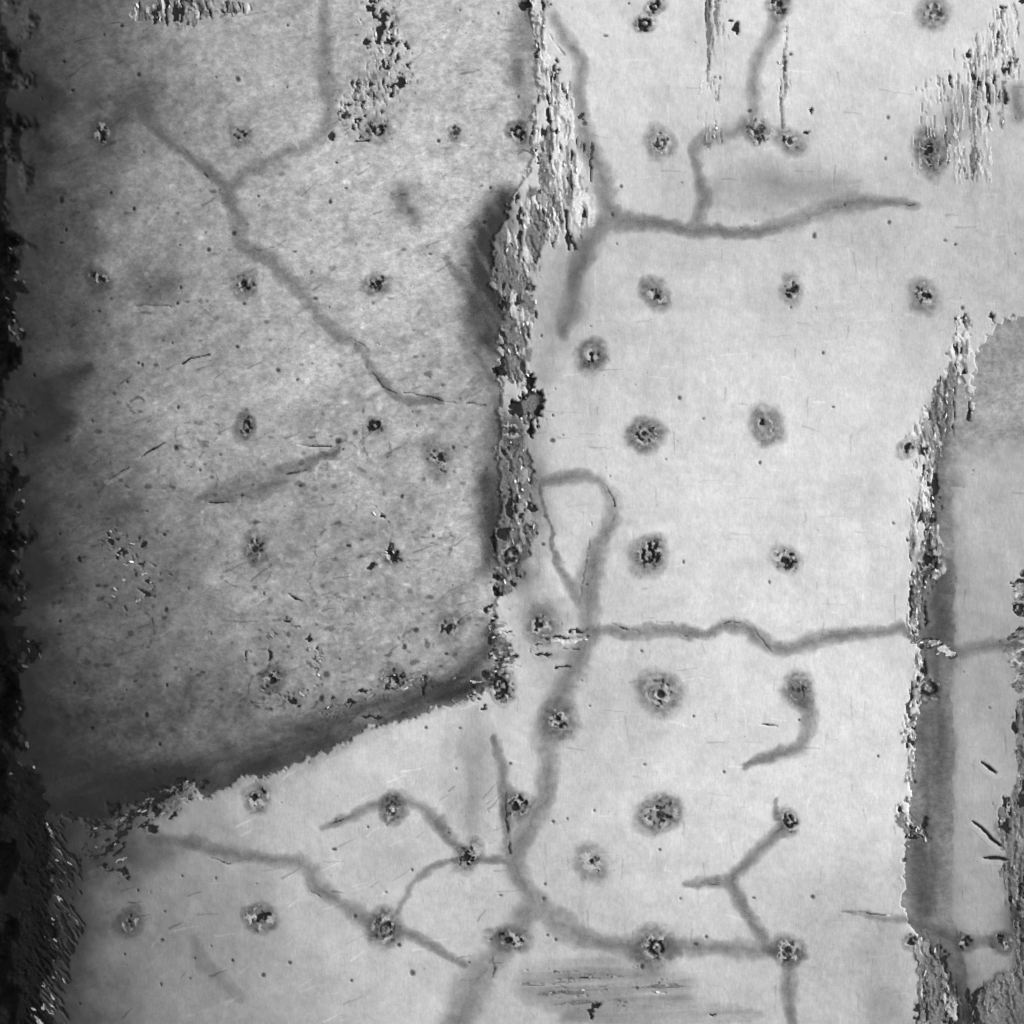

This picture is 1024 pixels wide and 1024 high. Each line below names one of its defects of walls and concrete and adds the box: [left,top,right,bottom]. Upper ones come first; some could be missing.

leakage [0,58,56,153]
crack [117,102,290,221]
crack [555,20,917,333]
crack [750,0,784,94]
leakage [466,189,512,351]
crack [337,337,484,405]
peeling [0,0,603,1024]
leakage [0,223,339,1024]
leakage [342,624,513,730]
crack [151,471,917,1024]
leakage [918,547,948,640]
peeling [895,312,1024,1024]